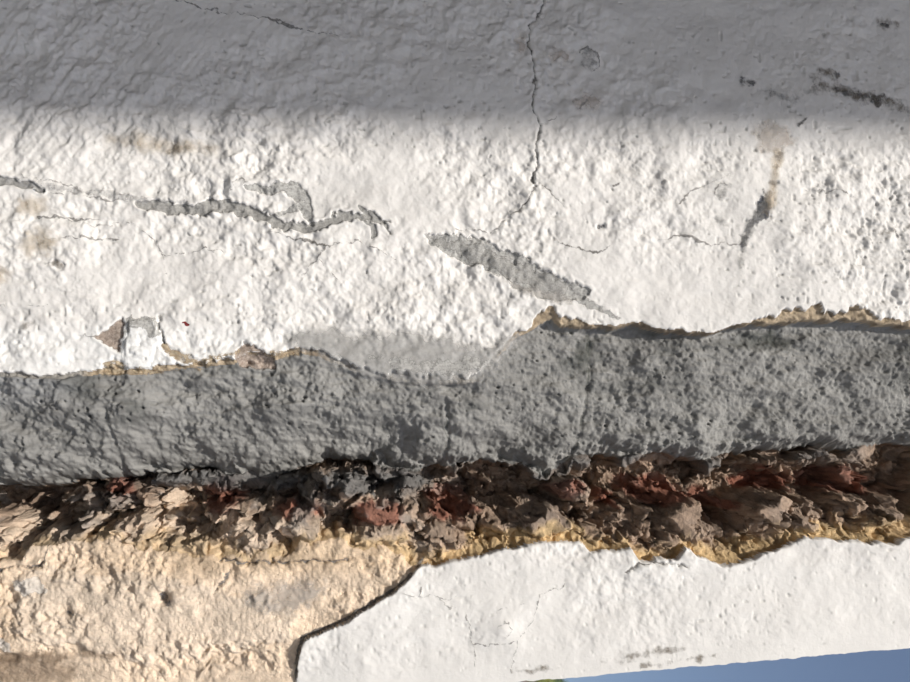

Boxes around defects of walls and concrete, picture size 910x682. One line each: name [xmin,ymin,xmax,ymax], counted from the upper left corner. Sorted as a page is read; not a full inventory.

peeling [0,176,391,239]
crack [494,0,553,230]
leakage [740,191,773,247]
spalling [0,229,910,682]